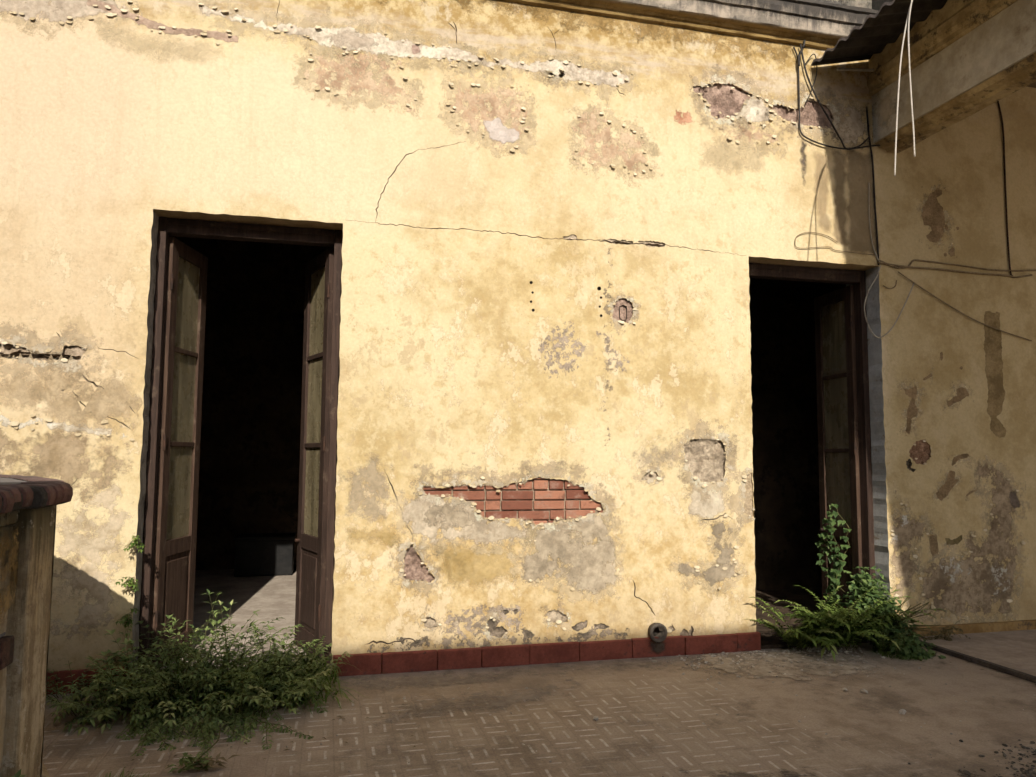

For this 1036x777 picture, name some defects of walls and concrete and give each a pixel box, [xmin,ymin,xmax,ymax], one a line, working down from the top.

peeling [0,0,633,112]
flaking render [674,64,845,144]
crack [348,141,746,256]
leakage [831,95,896,253]
peeling [922,188,959,243]
flaking render [0,323,102,384]
flaking render [904,374,933,472]
leakage [984,311,1006,438]
flaking render [414,461,617,541]
flaking render [673,420,755,526]
peeling [678,536,742,590]
peeling [367,601,630,653]